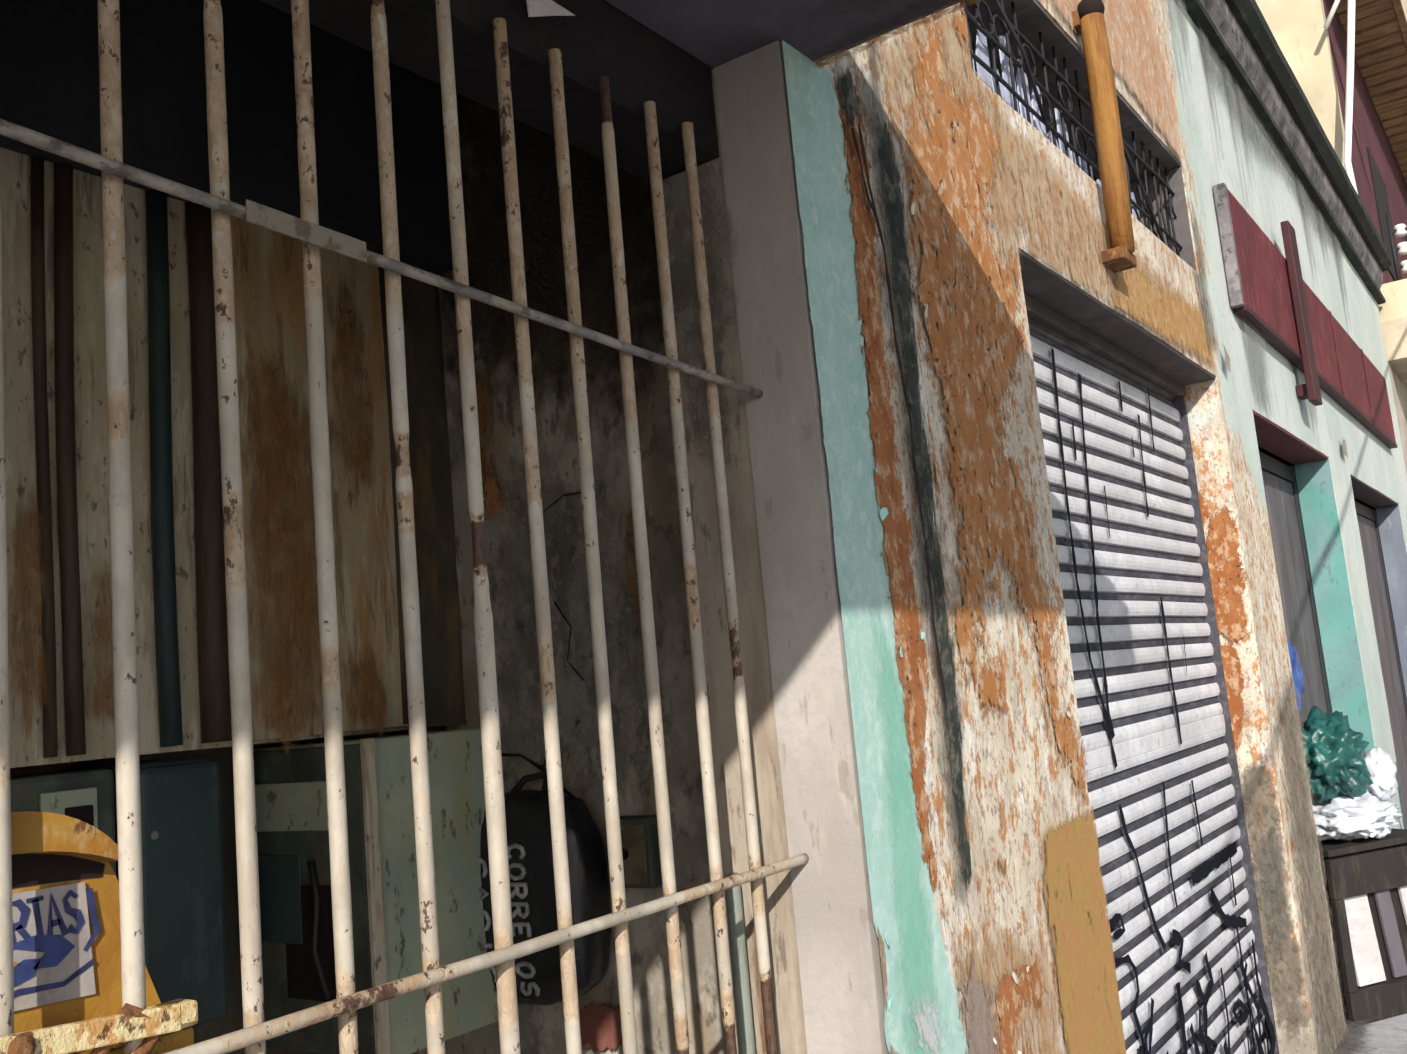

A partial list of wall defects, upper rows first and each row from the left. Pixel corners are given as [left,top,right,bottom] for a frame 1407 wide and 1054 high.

peeling [836,108,941,892]
peeling [874,0,1204,806]
peeling [1198,490,1250,761]
peeling [877,921,1063,1054]
damp [1239,673,1348,1054]